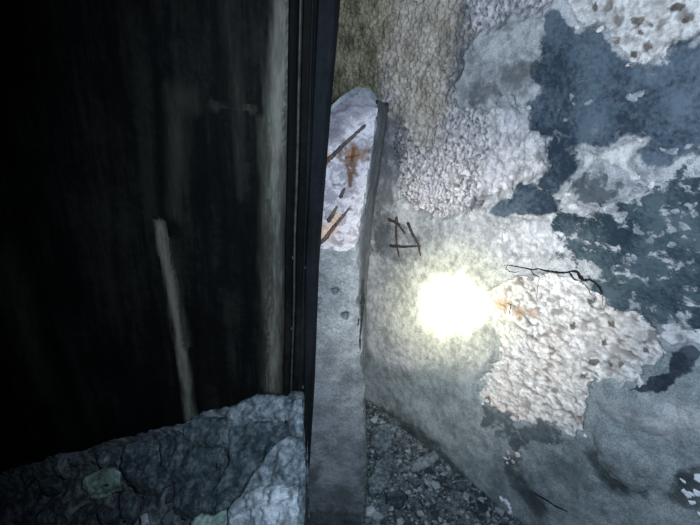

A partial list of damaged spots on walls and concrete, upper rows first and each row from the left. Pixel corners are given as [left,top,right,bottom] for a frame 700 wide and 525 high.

flaking render [568,0,700,67]
flaking render [626,89,645,102]
flaking render [320,0,551,251]
rust [338,143,370,187]
flaking render [583,136,646,182]
flaking render [659,143,693,155]
flaking render [501,213,591,258]
flaking render [622,223,654,255]
flaking render [666,202,698,231]
crack [504,265,603,306]
flaking render [479,273,700,438]